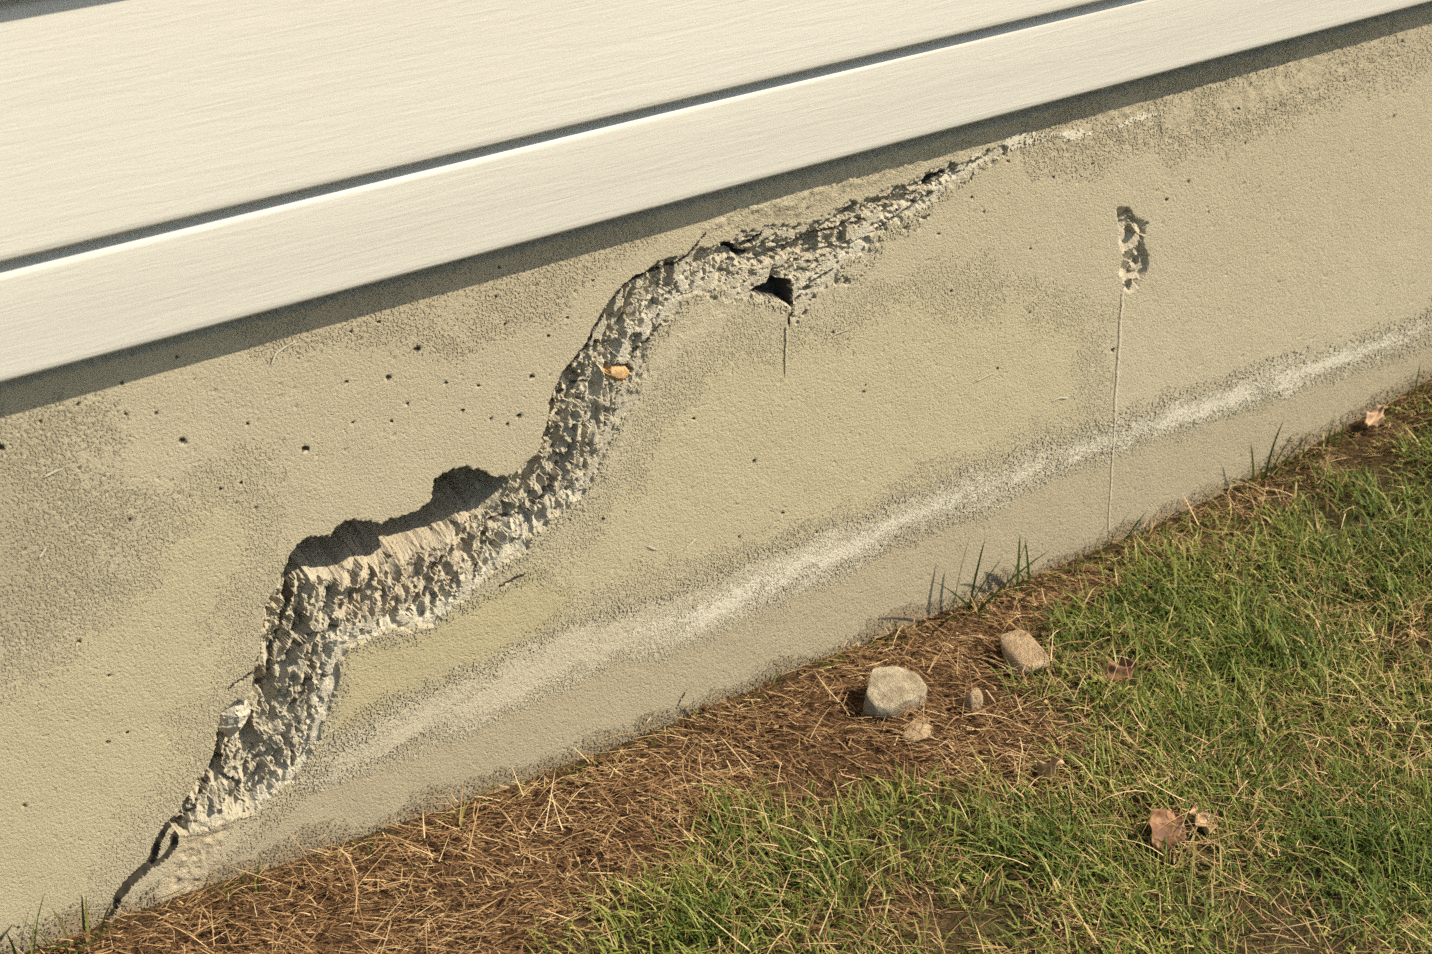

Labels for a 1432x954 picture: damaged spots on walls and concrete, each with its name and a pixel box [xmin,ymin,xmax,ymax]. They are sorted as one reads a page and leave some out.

water stain [222,211,667,364]
spalling [170,17,1406,834]
water stain [206,247,1432,885]